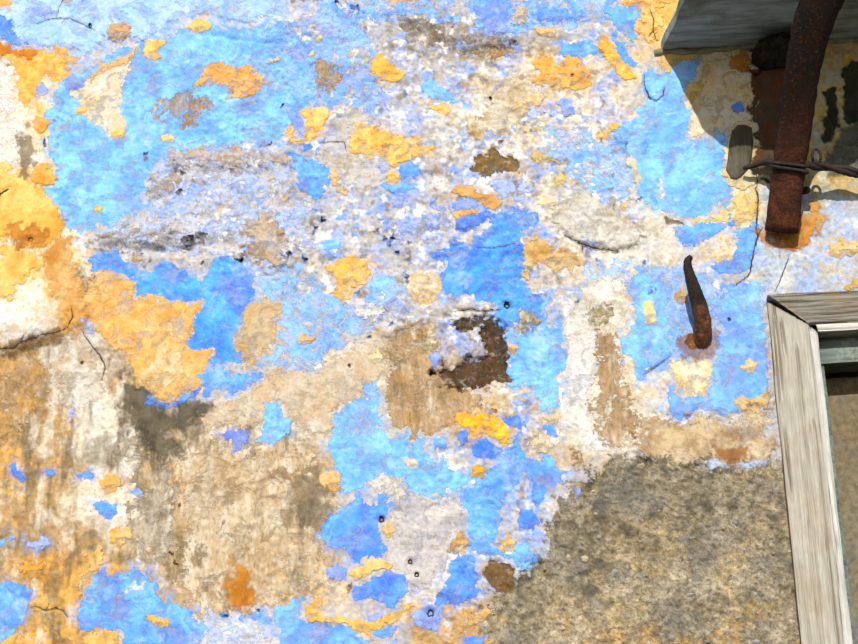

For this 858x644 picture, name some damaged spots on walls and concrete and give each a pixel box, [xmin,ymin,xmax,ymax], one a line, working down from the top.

peeling [530,52,761,274]
rust [729,49,786,176]
rust [755,200,826,251]
damp [821,60,858,176]
crack [0,308,105,380]
peeling [0,0,610,596]
spalling [444,258,800,644]
peeling [411,554,481,631]